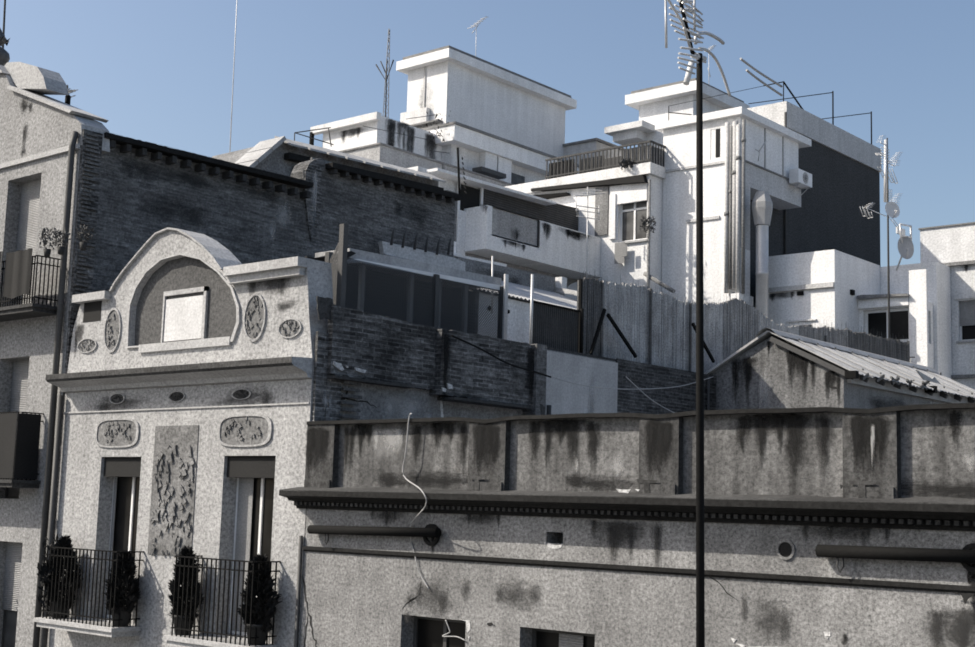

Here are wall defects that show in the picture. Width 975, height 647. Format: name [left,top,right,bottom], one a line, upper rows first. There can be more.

leakage [387,119,435,159]
leakage [786,349,840,401]
leakage [529,420,629,490]
leakage [646,420,671,473]
leakage [731,357,830,469]
leakage [851,400,902,469]
leakage [949,410,962,439]
leakage [901,484,975,498]
leakage [933,610,975,647]